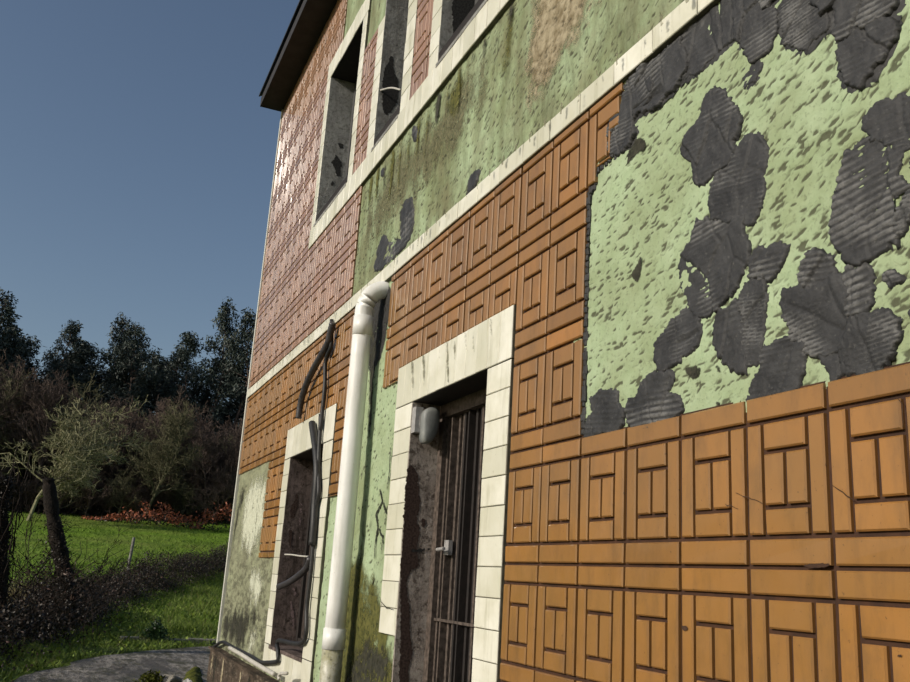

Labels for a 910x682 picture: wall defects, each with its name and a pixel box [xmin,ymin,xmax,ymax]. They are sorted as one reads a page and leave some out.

spalling [344,0,386,46]
water stain [472,5,513,66]
water stain [367,65,487,239]
spalling [353,0,684,296]
spalling [574,0,910,438]
water stain [223,608,259,648]
spalling [313,496,337,682]
water stain [341,531,392,682]
spalling [351,317,398,619]
crack [374,447,391,559]